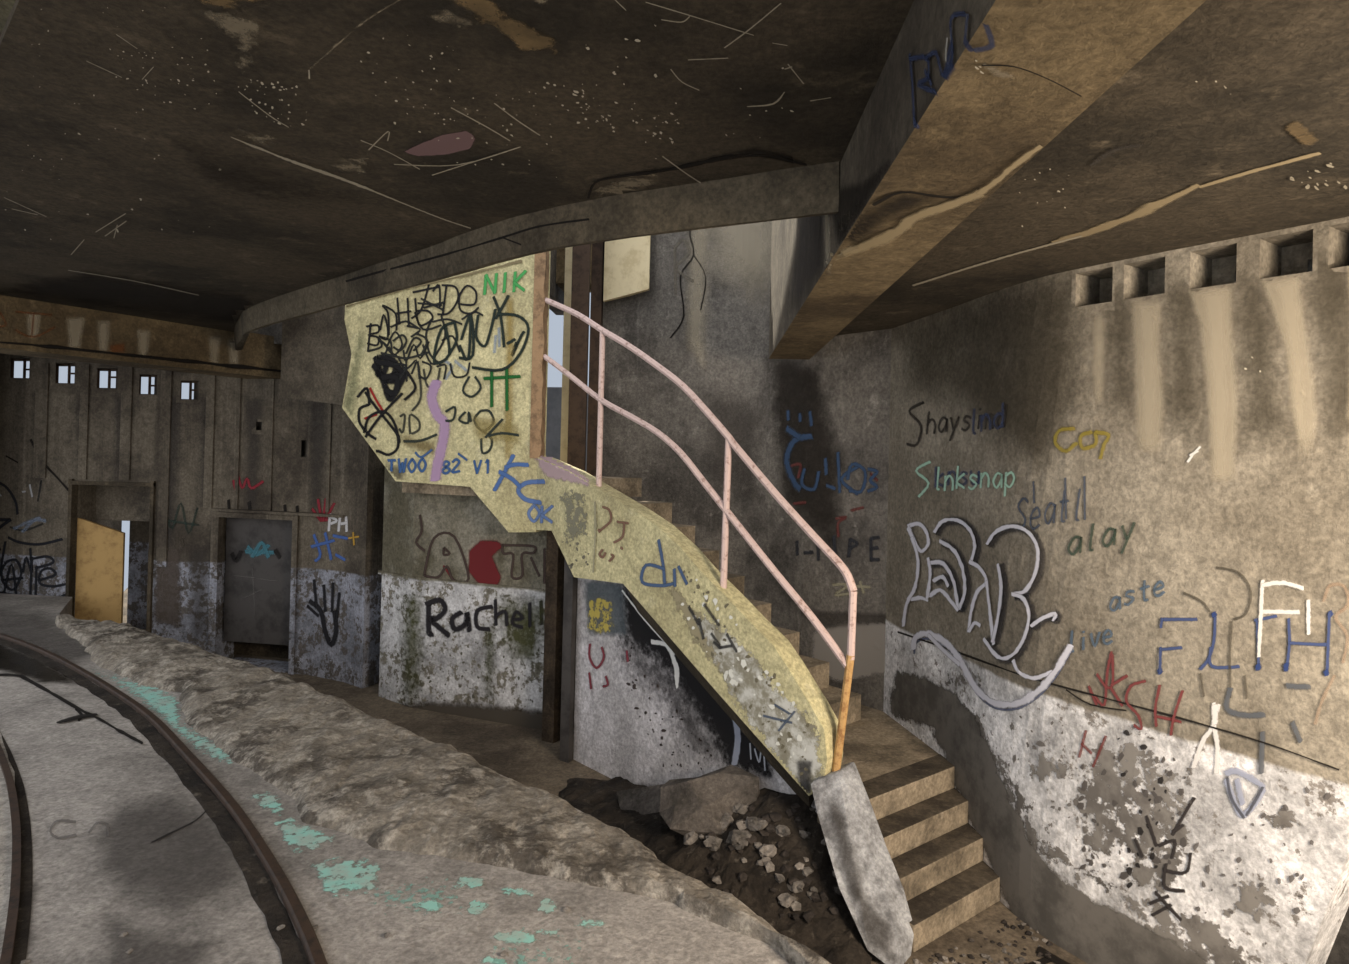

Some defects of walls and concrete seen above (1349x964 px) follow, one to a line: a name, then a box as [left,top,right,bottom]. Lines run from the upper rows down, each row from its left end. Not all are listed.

crack [670,231,706,338]
water stain [915,295,1063,437]
water stain [401,598,545,730]
spalling [55,545,831,964]
peeling [813,613,1304,964]